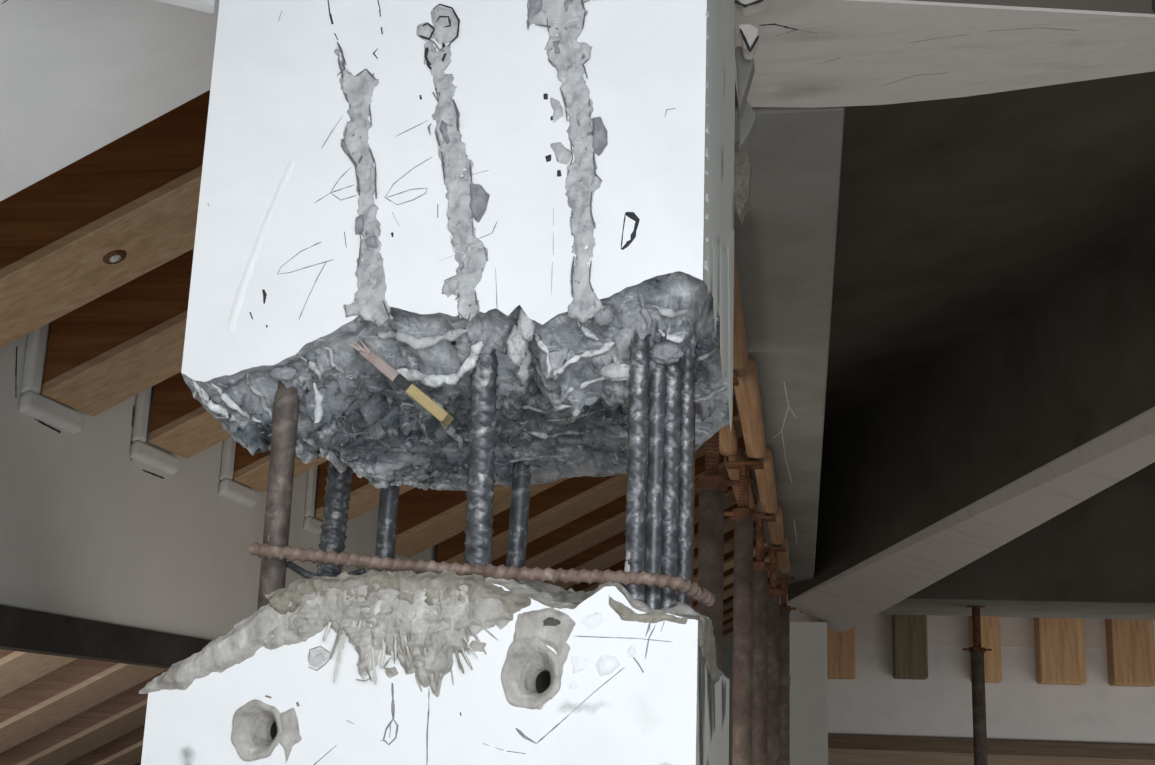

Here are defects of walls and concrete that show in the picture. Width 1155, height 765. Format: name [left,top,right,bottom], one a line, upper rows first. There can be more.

spalling [139,0,798,694]